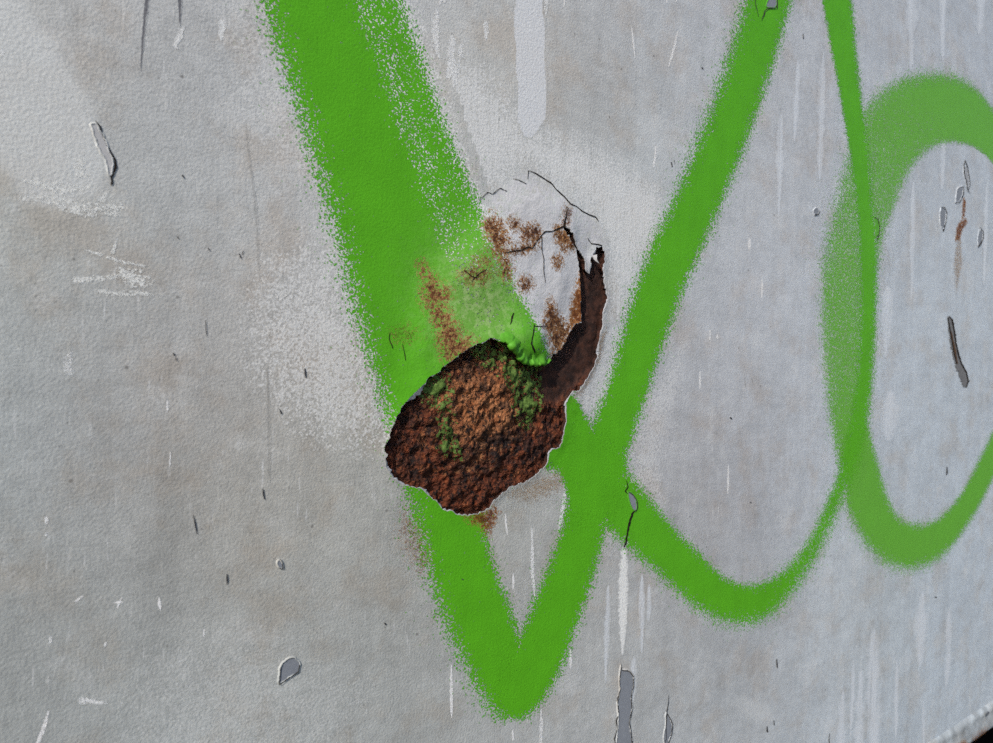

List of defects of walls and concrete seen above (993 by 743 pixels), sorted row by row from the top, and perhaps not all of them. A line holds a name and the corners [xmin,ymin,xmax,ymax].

peeling [755,0,778,19]
peeling [0,0,120,222]
peeling [346,0,678,424]
crack [480,170,602,283]
rust [384,202,609,537]
spalling [948,316,970,387]
crack [624,483,635,547]
peeling [81,593,397,743]
peeling [614,664,634,743]
peeling [662,698,673,743]